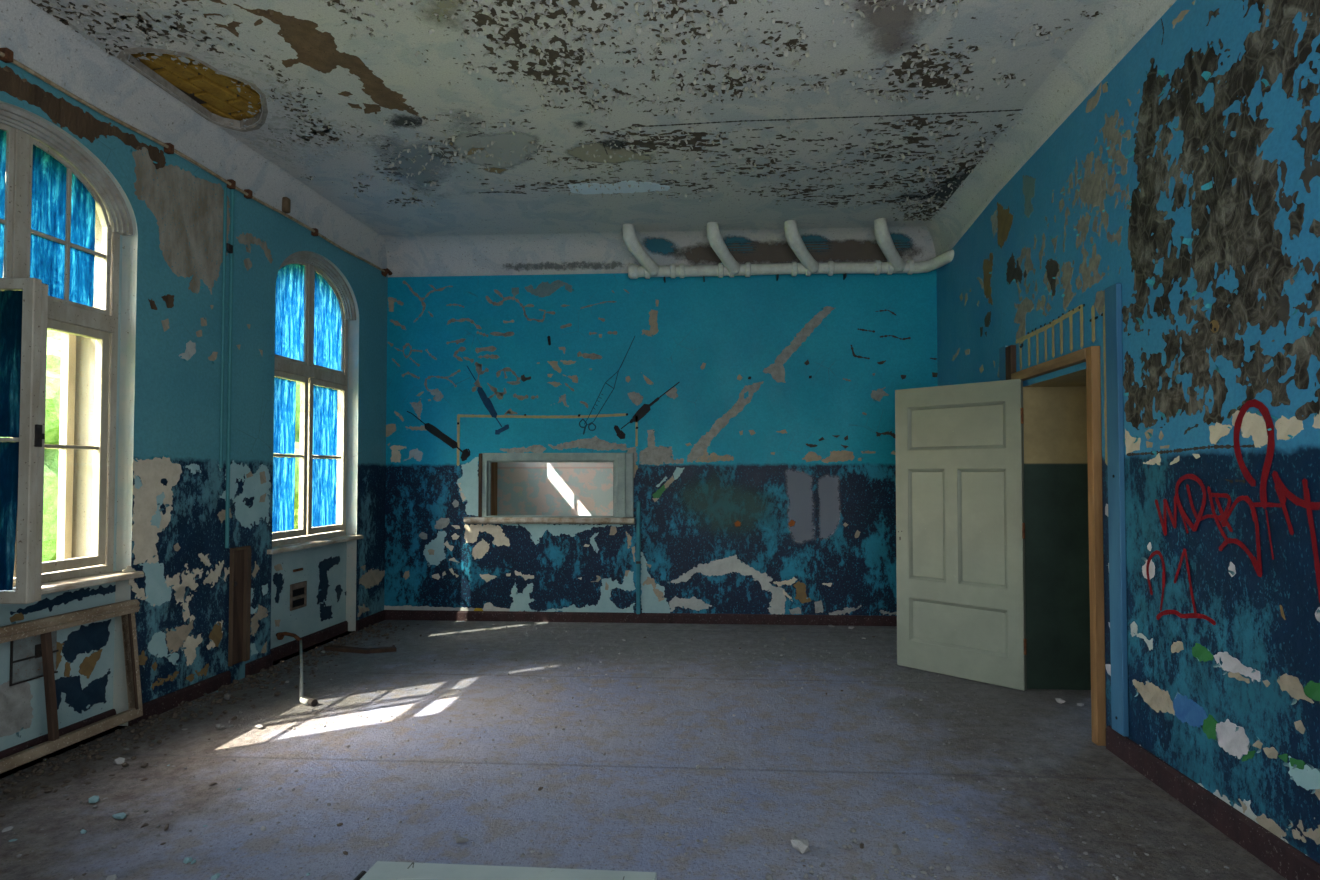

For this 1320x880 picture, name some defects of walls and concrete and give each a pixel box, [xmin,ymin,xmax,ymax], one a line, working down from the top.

leakage [860,0,917,53]
spalling [29,0,1026,222]
leakage [384,115,540,189]
leakage [567,139,651,163]
leakage [902,167,975,200]
peeling [959,0,1320,465]
peeling [217,460,271,529]
spalling [500,429,734,502]
peeling [10,455,230,690]
peeling [357,457,861,617]
peeling [1171,641,1320,705]
peeling [1198,783,1320,856]